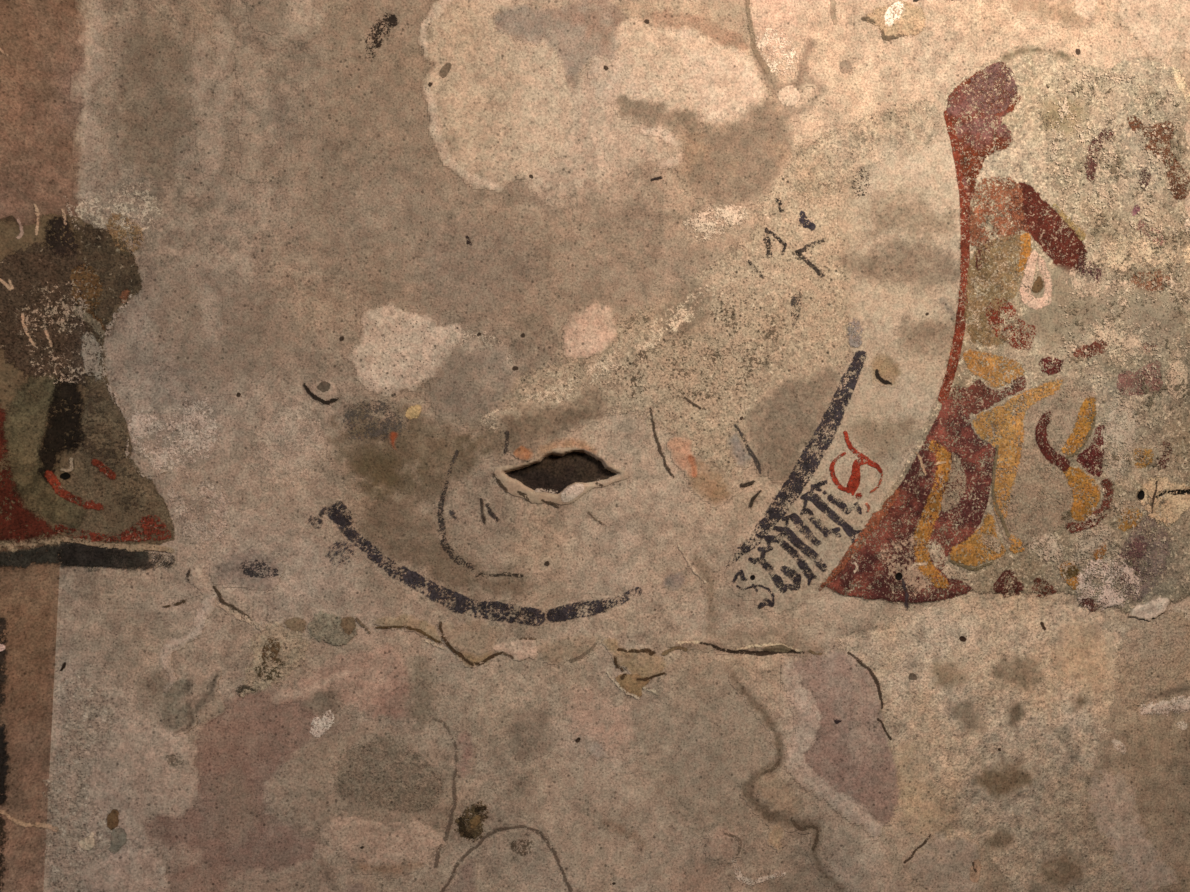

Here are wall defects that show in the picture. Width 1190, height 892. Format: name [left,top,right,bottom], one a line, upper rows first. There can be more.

leakage [613,0,831,214]
peeling [0,216,24,239]
leakage [72,0,667,553]
flaking render [340,97,946,508]
flaking render [1137,476,1190,527]
crack [432,717,588,892]
crack [904,831,982,892]